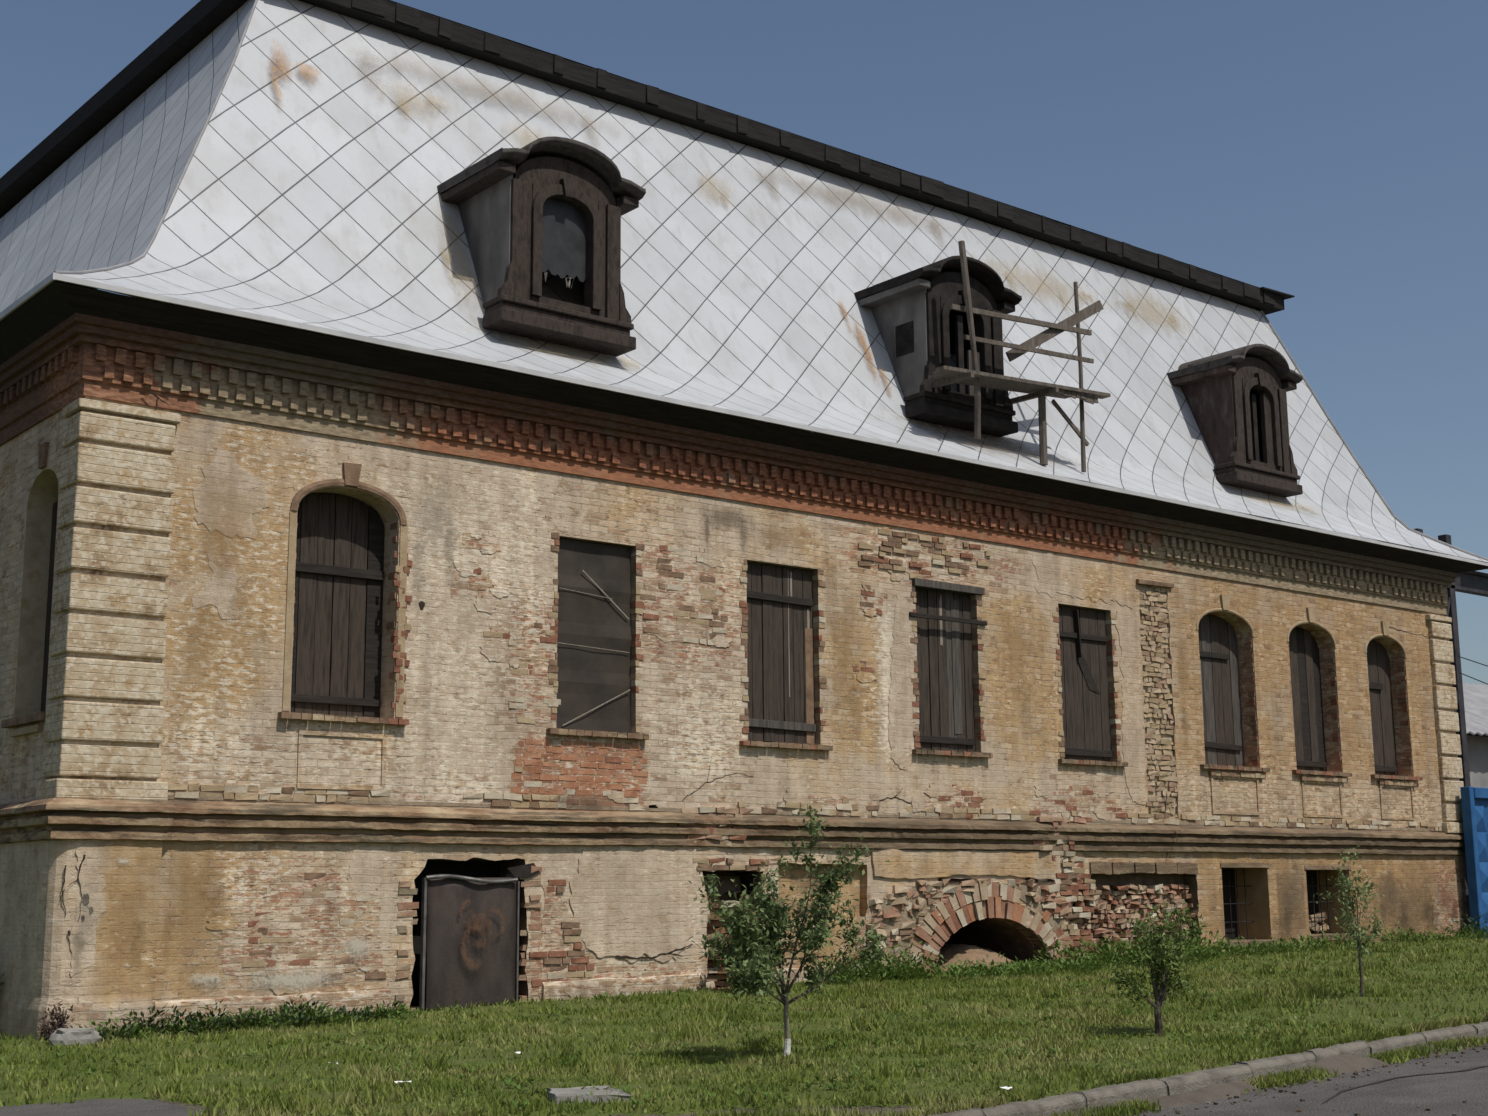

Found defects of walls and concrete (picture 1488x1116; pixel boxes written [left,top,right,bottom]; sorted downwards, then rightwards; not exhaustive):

flaking render [451,531,648,803]
spalling [1029,551,1179,821]
flaking render [529,846,779,1000]
peeling [782,884,968,972]
spalling [1008,851,1201,961]